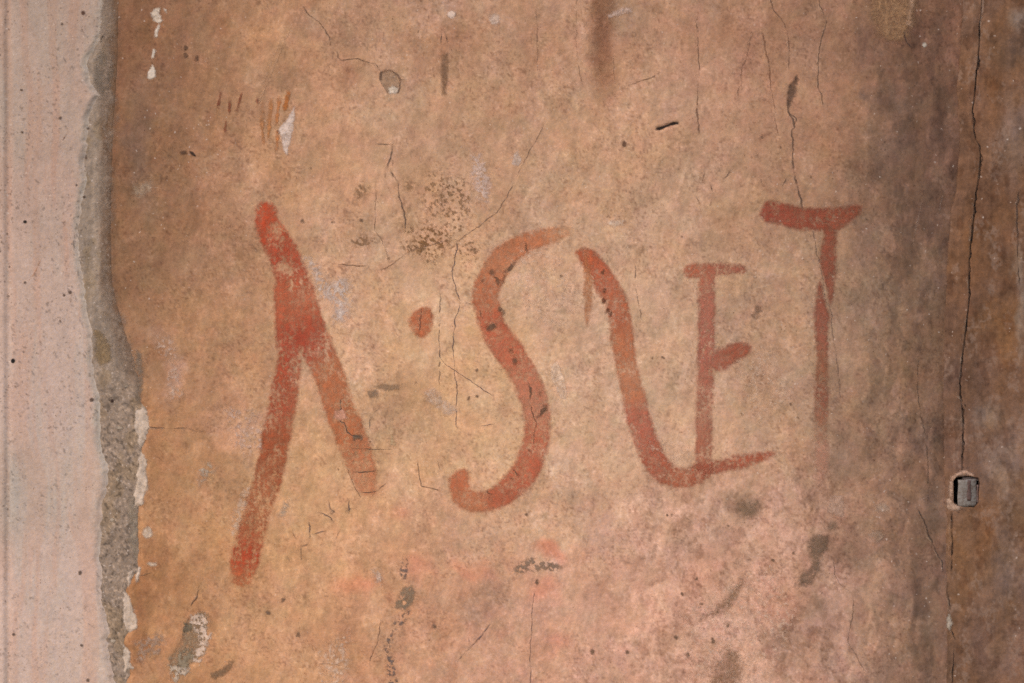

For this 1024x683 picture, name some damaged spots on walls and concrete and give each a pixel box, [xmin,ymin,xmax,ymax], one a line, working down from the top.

spalling [379,70,401,94]
crack [737,0,790,93]
crack [774,110,802,206]
crack [959,1,984,458]
crack [343,144,512,424]
spalling [137,613,212,682]